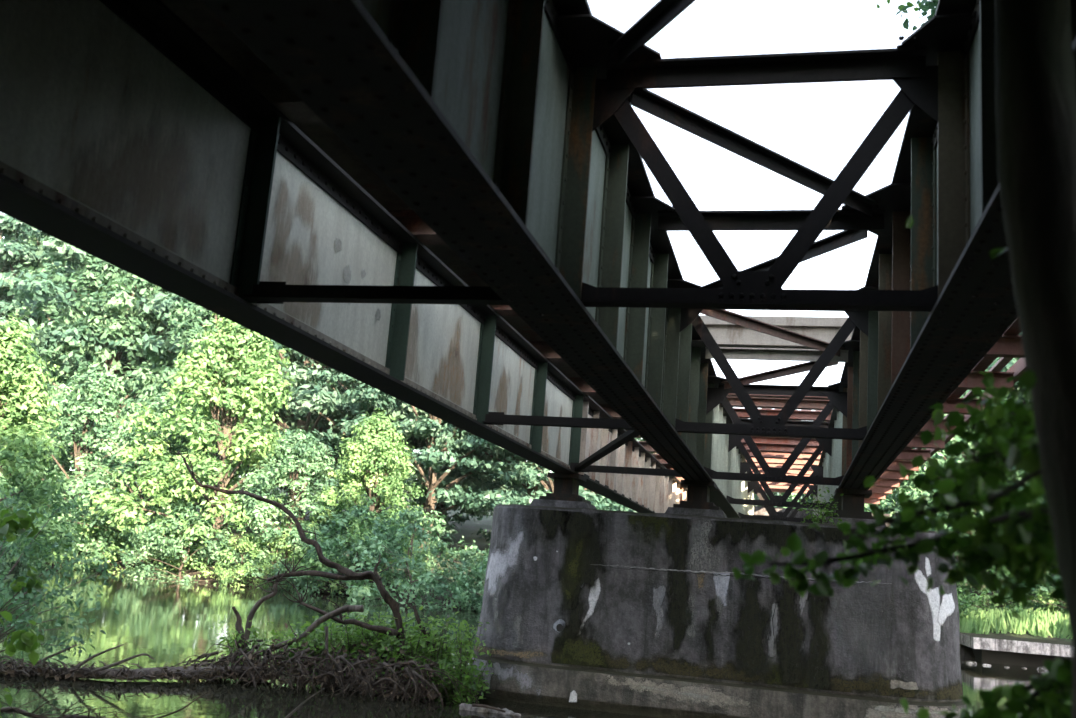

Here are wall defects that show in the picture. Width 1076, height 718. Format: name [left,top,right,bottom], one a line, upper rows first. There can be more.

damp [486,509,569,632]
damp [579,578,601,634]
damp [652,585,666,636]
damp [685,519,866,661]